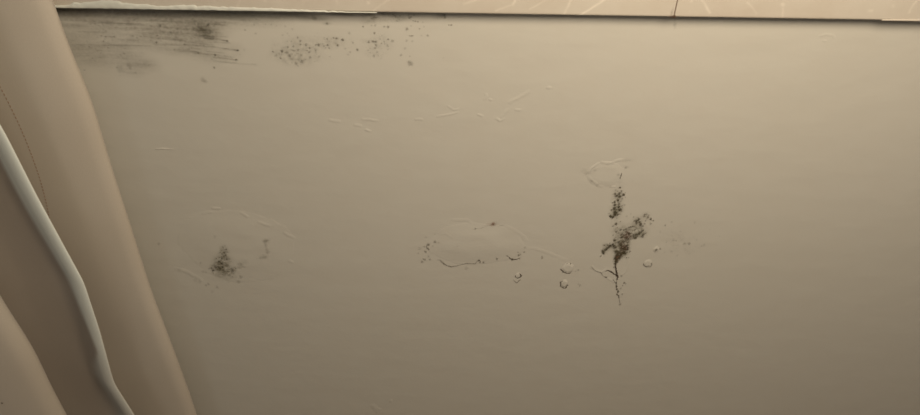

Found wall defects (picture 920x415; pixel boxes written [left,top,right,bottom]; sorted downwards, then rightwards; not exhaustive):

leakage [65,9,253,37]